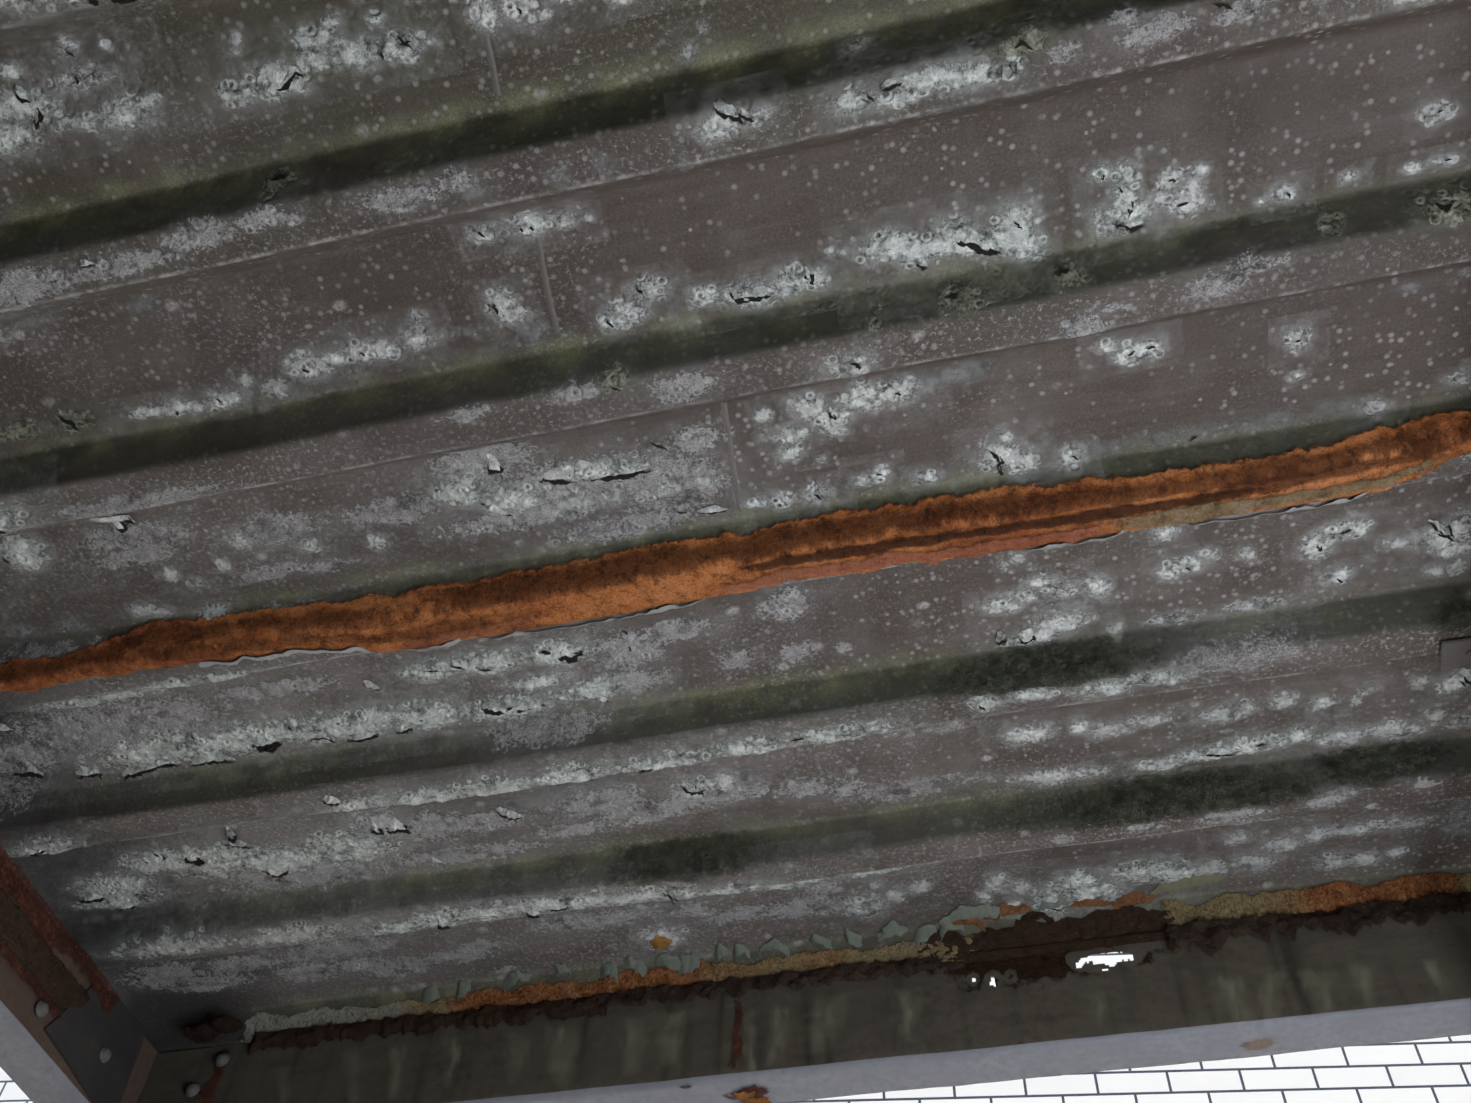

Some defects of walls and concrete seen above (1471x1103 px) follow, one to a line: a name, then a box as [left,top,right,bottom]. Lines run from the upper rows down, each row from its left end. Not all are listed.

rust [0,0,79,18]
rust [547,379,604,404]
rust [646,368,719,407]
rust [755,351,922,463]
rust [1448,372,1470,384]
rust [0,401,1471,812]
rust [0,721,1471,1103]
peeling [810,873,1225,950]